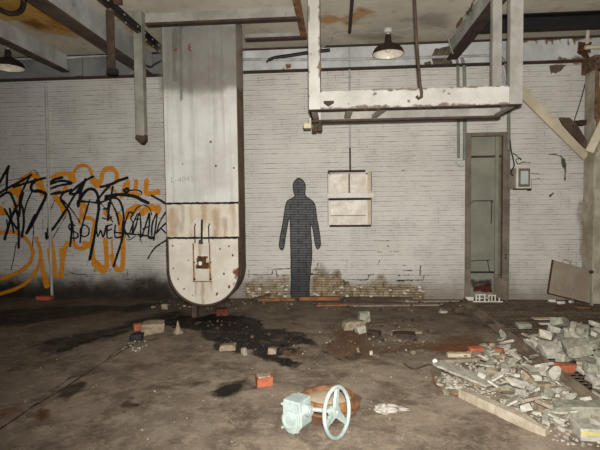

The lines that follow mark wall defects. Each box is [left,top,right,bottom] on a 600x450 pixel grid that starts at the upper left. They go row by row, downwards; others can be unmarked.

spalling [550,64,566,75]
peeling [245,278,289,298]
peeling [313,272,425,298]
leakage [0,279,169,325]